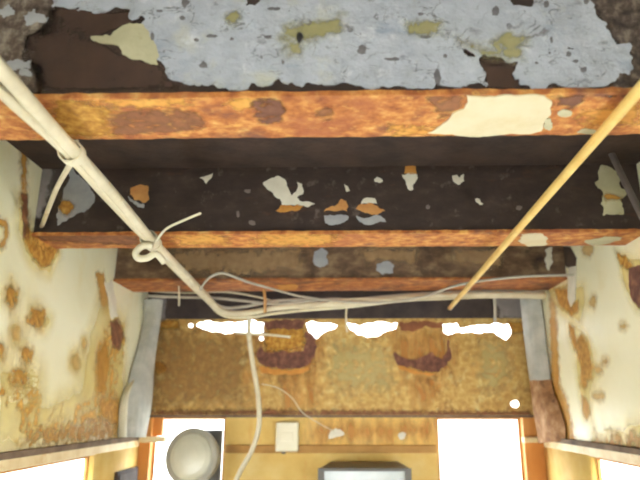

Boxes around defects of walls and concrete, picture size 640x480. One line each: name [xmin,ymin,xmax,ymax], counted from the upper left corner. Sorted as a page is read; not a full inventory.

peeling [52,0,633,91]
corrosion [51,99,186,138]
peeling [56,169,95,225]
peeling [263,176,314,212]
peeling [324,197,386,225]
peeling [595,165,627,216]
corrosion [249,234,342,246]
corrosion [617,253,640,308]
corrosion [0,273,125,447]
leakage [150,327,532,415]
corrosion [549,246,596,440]
corrosion [569,325,607,419]